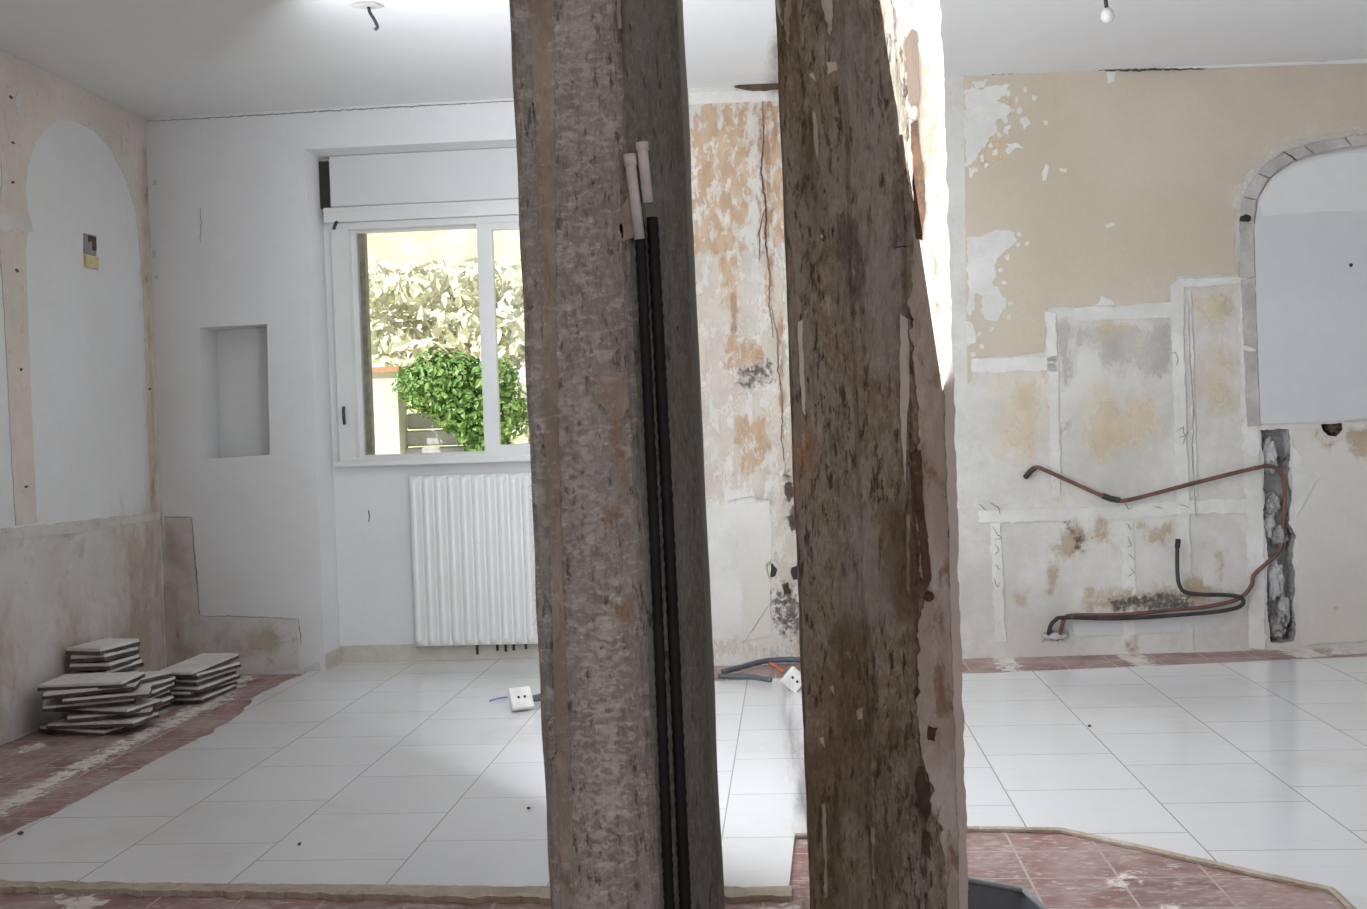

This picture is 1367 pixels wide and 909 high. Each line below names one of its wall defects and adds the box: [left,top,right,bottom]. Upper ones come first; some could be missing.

peeling [963,79,1049,179]
peeling [964,230,1030,357]
leakage [783,470,795,526]
leakage [770,581,800,643]